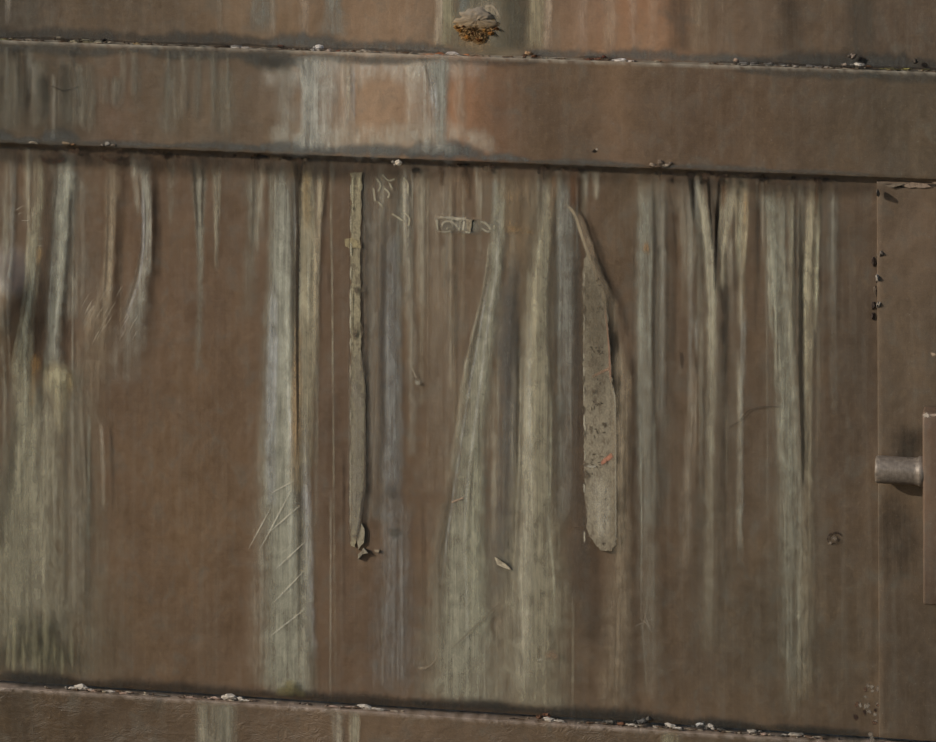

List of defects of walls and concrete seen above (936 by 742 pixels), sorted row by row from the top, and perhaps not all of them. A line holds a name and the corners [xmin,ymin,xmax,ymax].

leakage [4,171,71,632]
leakage [103,192,115,302]
leakage [130,171,150,320]
leakage [146,0,574,261]
peeling [344,172,409,559]
leakage [265,182,859,735]
peeling [568,206,617,551]
crack [798,185,818,482]
leakage [690,53,936,78]
leakage [0,672,69,687]
leakage [134,682,253,695]